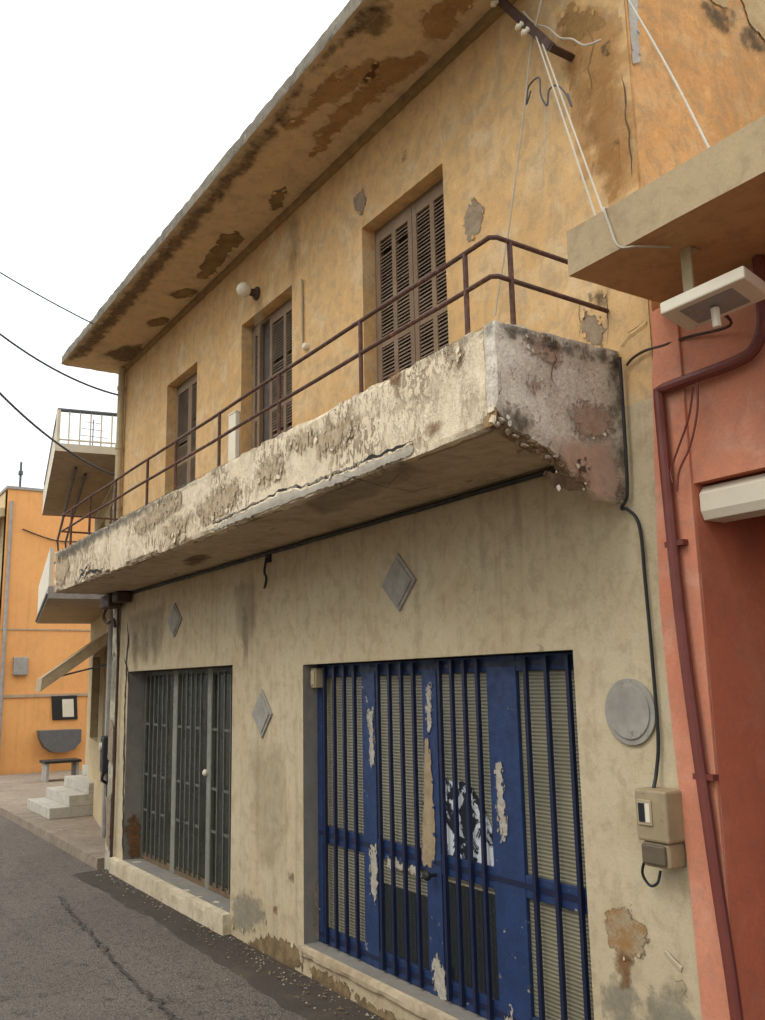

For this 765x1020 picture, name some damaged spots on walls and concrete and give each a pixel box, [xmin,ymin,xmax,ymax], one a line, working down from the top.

peeling [417,0,473,44]
damp [703,2,734,32]
damp [741,26,764,51]
peeling [284,52,428,157]
peeling [463,198,485,242]
peeling [169,231,245,299]
peeling [522,333,564,367]
peeling [581,294,607,348]
peeling [255,411,360,490]
spalling [483,399,617,491]
peeling [133,479,241,547]
flaking render [604,904,650,988]